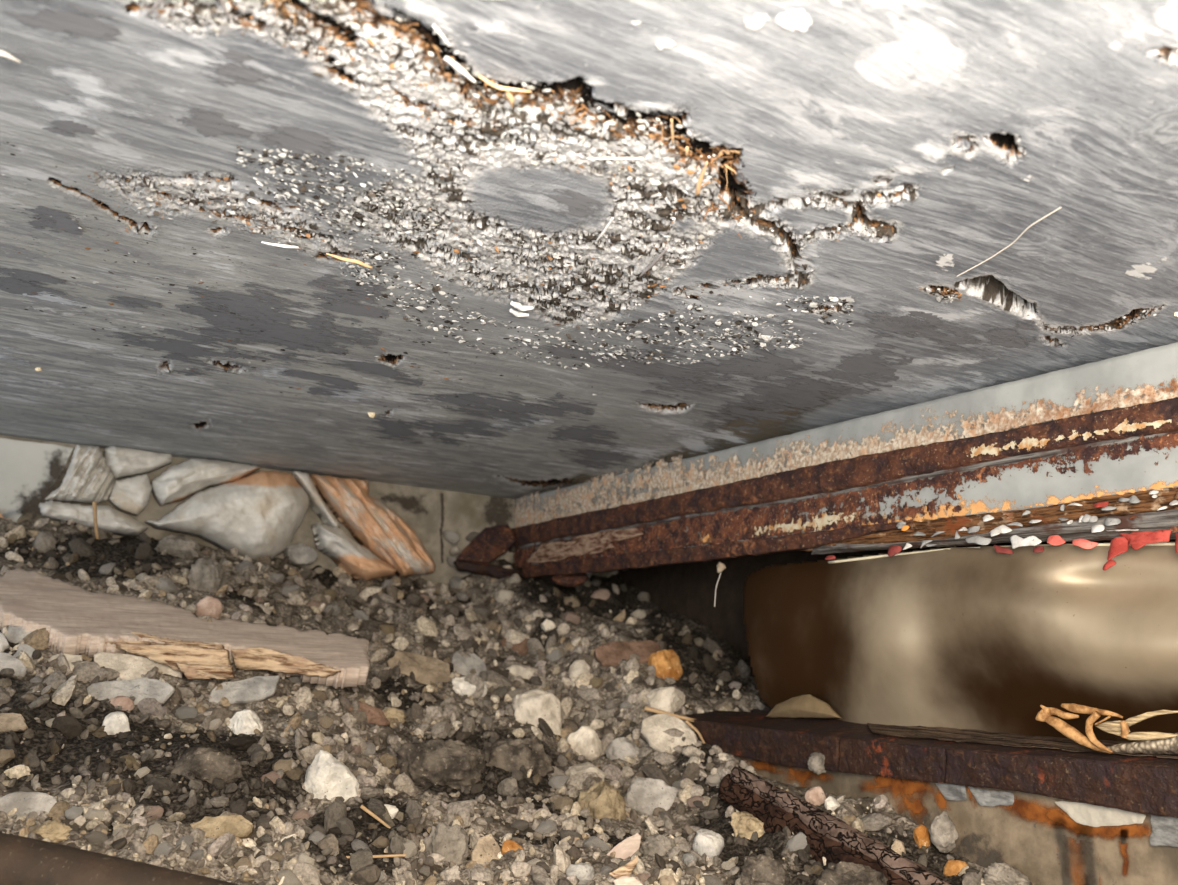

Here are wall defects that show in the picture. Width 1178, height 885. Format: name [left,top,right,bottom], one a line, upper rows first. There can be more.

spalling [50,0,857,384]
spalling [867,166,899,187]
spalling [915,278,962,307]
spalling [1032,298,1175,350]
corrosion [514,418,1178,578]
peeling [888,490,1178,570]
corrosion [752,760,832,786]
corrosion [861,776,947,817]
corrosion [1006,798,1150,885]